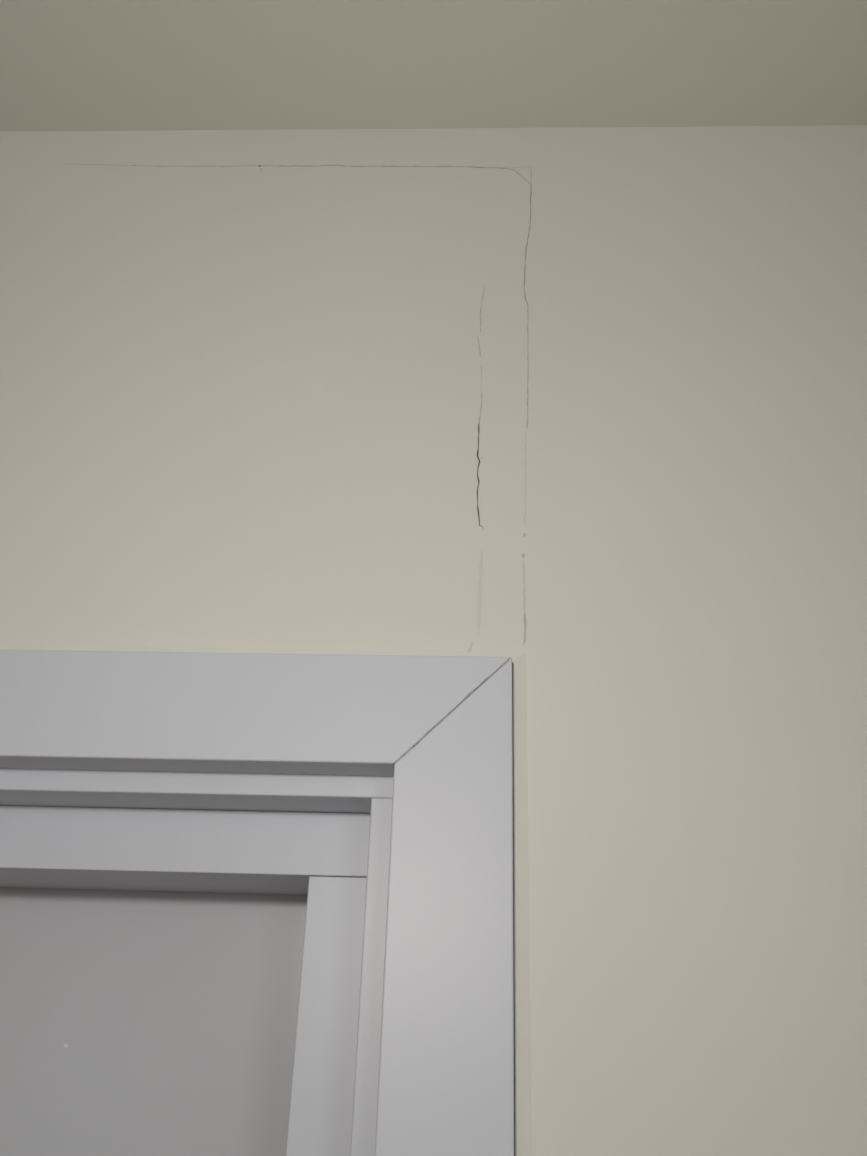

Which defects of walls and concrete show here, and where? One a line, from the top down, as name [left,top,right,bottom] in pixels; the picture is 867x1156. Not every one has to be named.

crack [19,164,532,762]